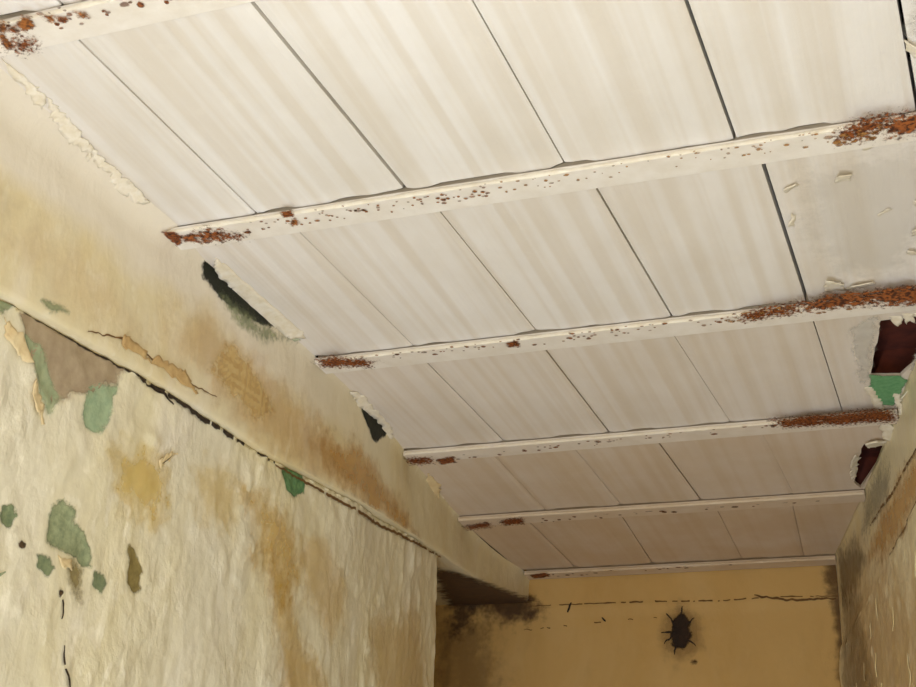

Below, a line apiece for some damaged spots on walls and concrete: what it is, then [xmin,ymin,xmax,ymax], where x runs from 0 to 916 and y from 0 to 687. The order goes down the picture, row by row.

corrosion [0,7,89,59]
corrosion [827,110,916,147]
corrosion [163,204,379,245]
peeling [202,258,305,341]
corrosion [689,285,916,326]
spalling [0,300,124,433]
spalling [853,313,916,415]
corrosion [761,408,900,428]
peeling [37,500,107,595]
mould [437,571,538,635]
water stain [661,606,696,655]
crack [63,645,71,687]